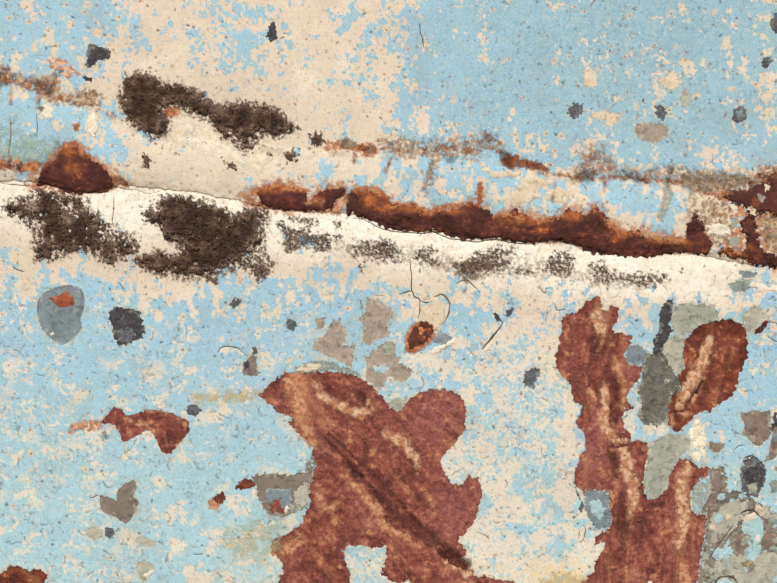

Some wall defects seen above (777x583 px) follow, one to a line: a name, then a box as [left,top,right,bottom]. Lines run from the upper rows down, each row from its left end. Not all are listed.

corrosion [0,140,128,196]
crack [108,186,159,221]
water stain [163,108,271,175]
crack [358,218,585,251]
corrosion [237,131,777,270]
peeling [37,286,85,345]
peeling [108,307,146,346]
spalling [625,299,719,427]
corrosion [668,318,768,432]
corrosion [197,370,514,583]
corrosion [542,296,710,583]
peeling [696,411,777,583]